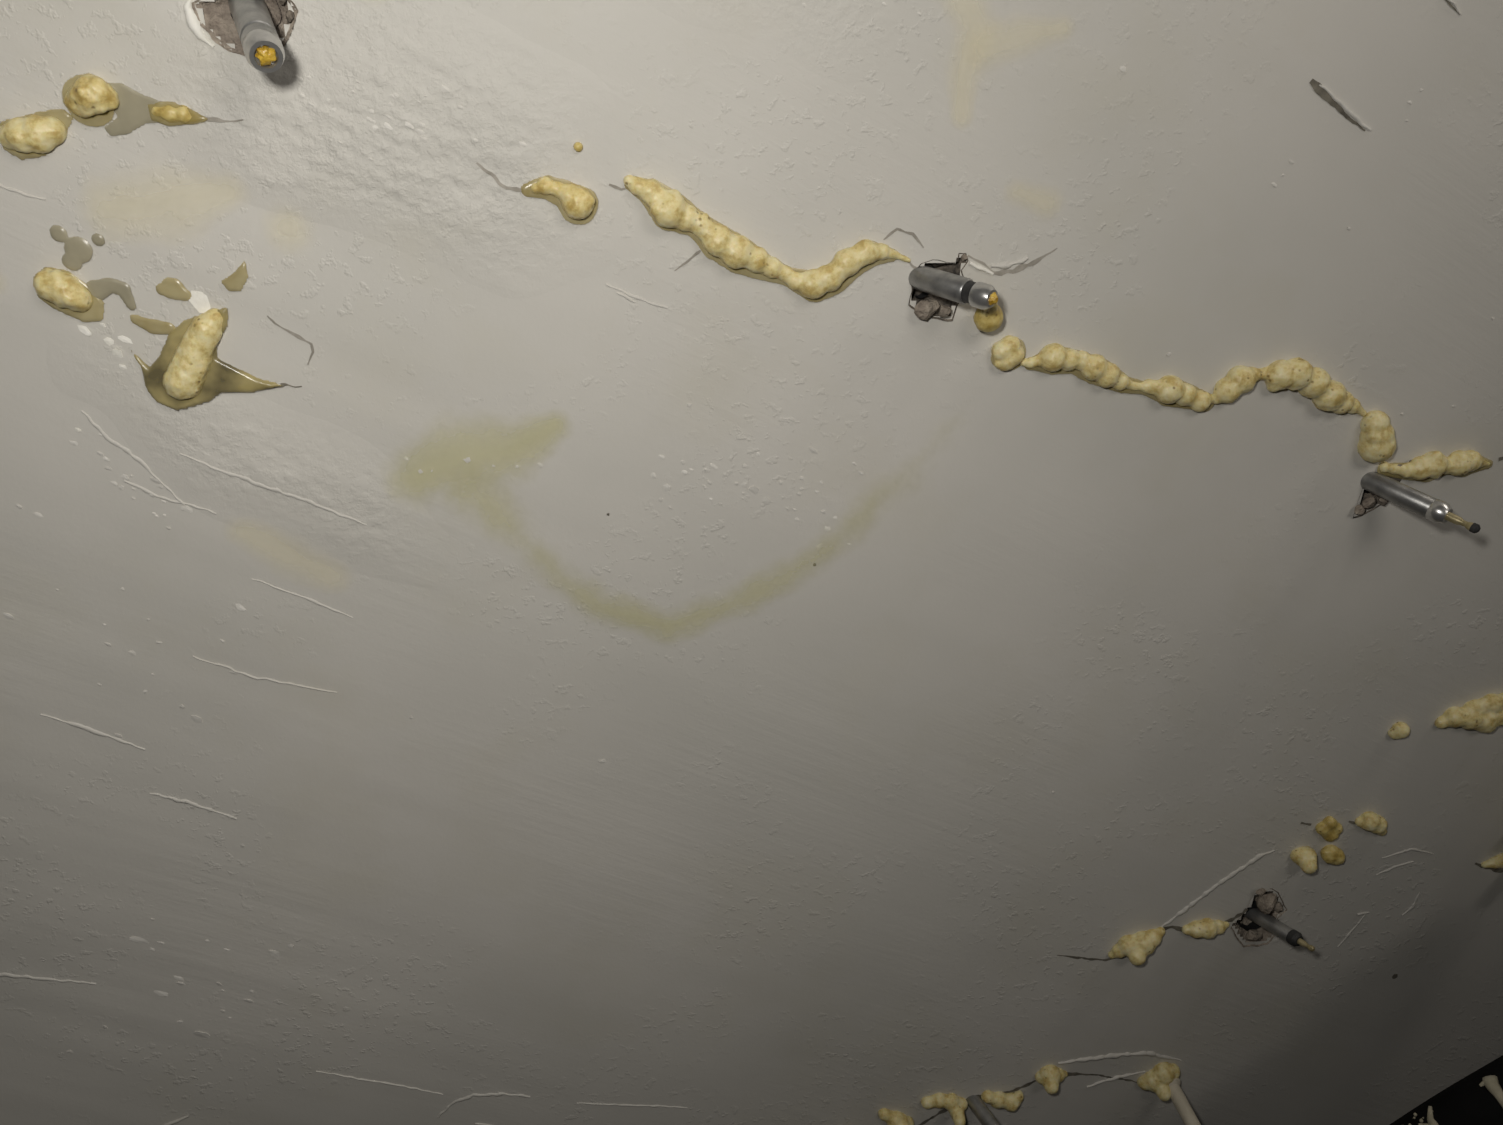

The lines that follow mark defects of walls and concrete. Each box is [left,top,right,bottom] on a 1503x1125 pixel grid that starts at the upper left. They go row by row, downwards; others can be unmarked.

crack [204,115,243,123]
crack [476,162,521,192]
crack [674,250,701,271]
crack [883,228,924,269]
crack [968,248,1057,276]
crack [265,315,314,390]
crack [1475,863,1503,873]
crack [1163,925,1182,933]
crack [1057,954,1115,962]
crack [919,1072,1137,1125]